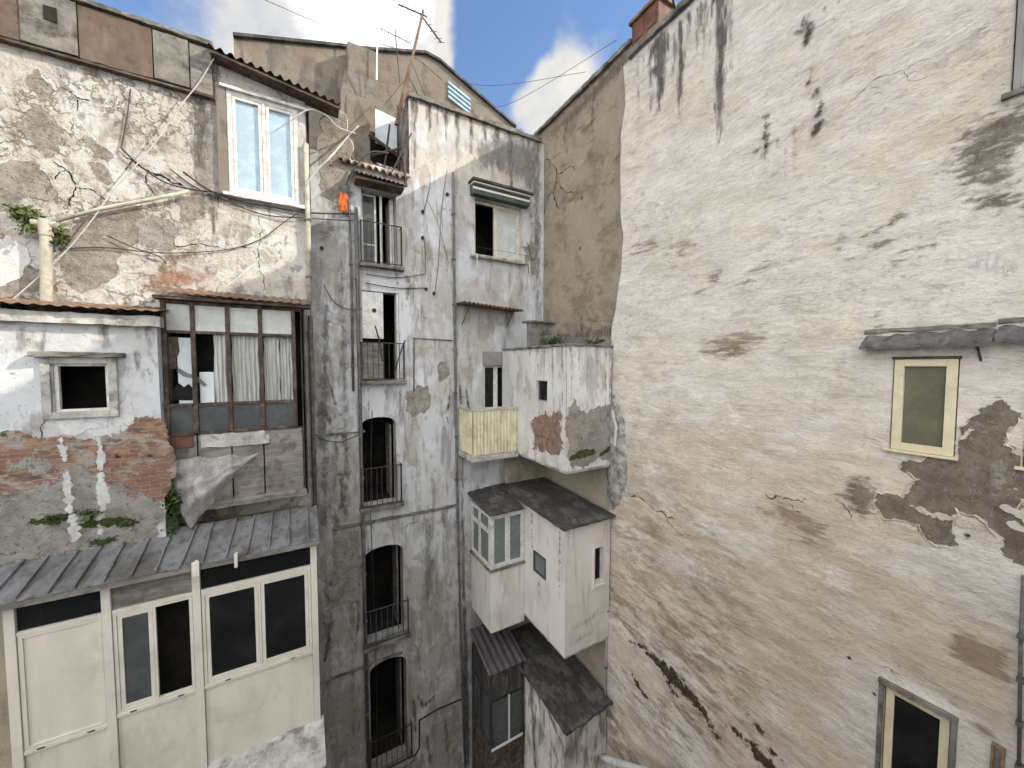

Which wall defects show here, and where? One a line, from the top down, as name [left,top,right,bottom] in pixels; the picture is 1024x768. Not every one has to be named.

water stain [649,0,730,124]
water stain [794,20,814,45]
water stain [806,80,824,135]
crack [544,159,574,213]
spalling [404,361,450,417]
flaking render [0,394,178,509]
spalling [530,399,611,468]
spalling [871,397,1024,568]
crack [629,641,782,768]